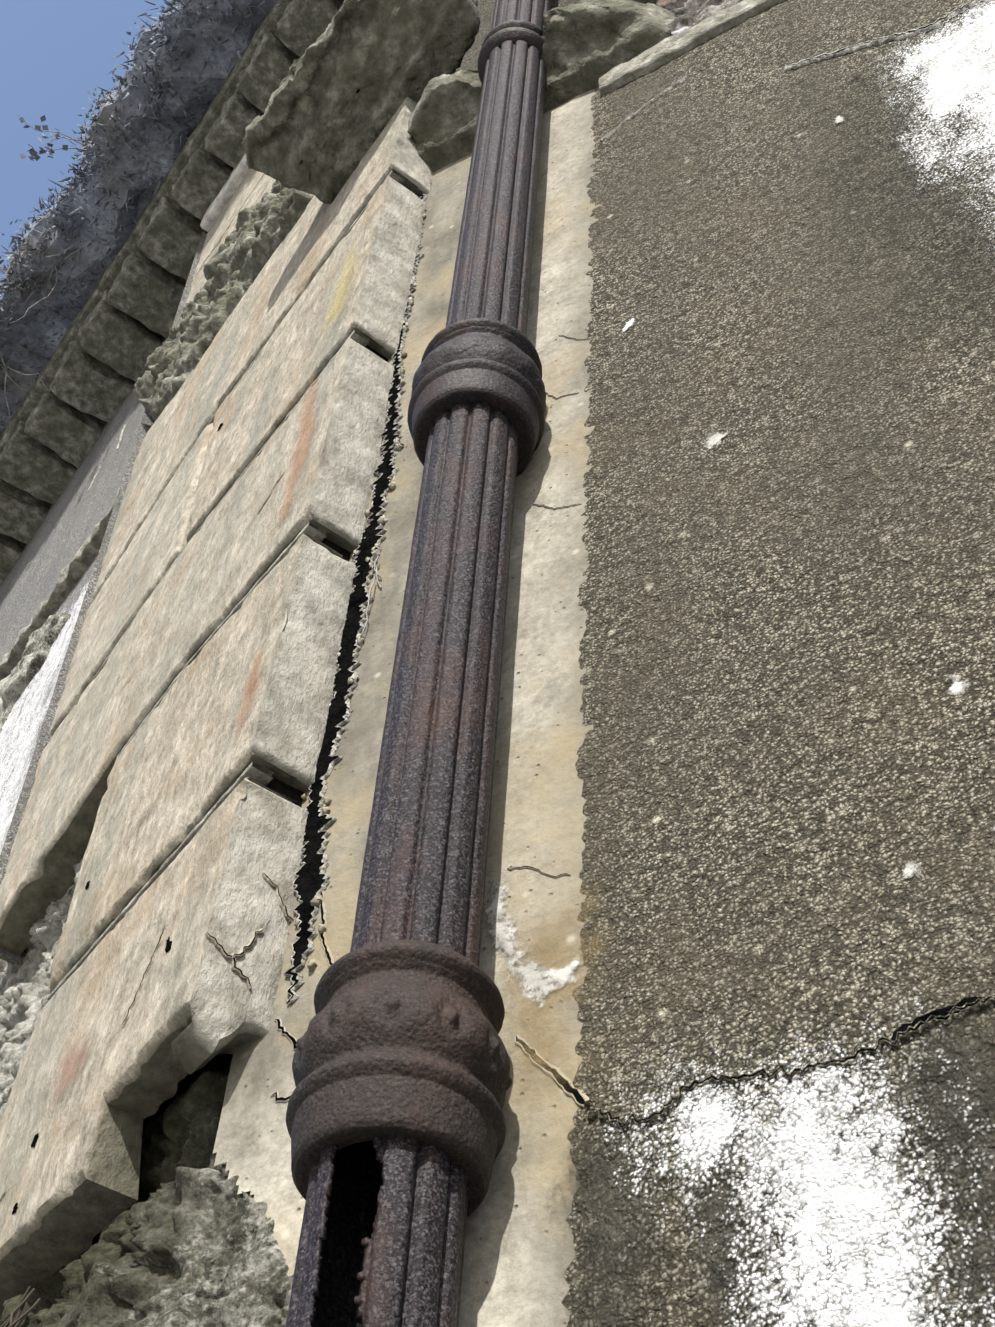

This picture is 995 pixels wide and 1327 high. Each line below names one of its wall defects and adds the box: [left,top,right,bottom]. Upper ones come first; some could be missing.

spalling [656,0,743,36]
leakage [877,0,995,248]
peeling [0,612,73,739]
leakage [0,572,89,855]
crack [205,182,431,1050]
spalling [0,859,90,1121]
spalling [0,1053,297,1327]
crack [270,1091,291,1103]
peeling [484,871,580,1008]
crack [514,995,995,1133]
leakage [571,1023,995,1327]